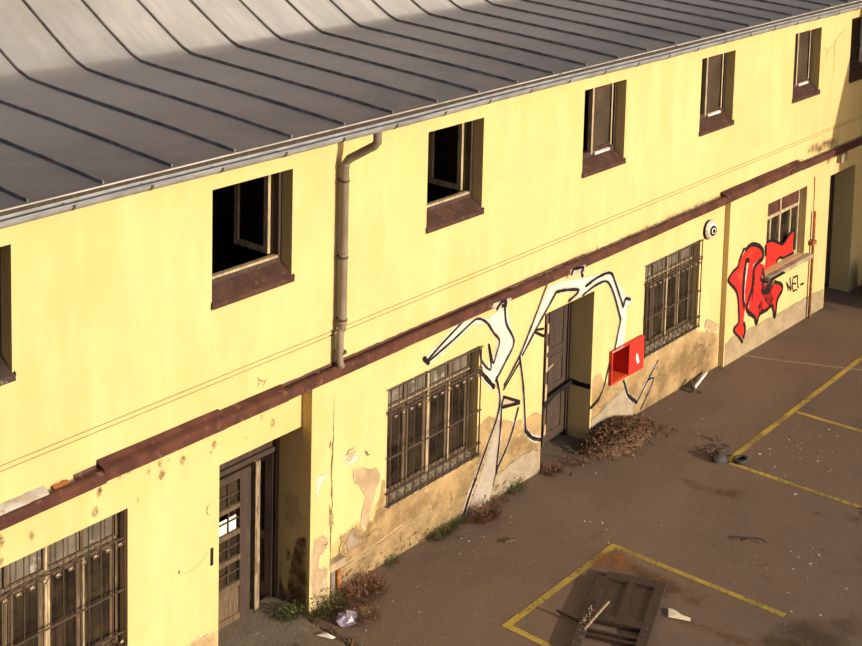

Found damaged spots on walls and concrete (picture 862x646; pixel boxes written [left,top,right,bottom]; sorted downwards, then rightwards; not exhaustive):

flaking render [339,412,541,588]
peeling [311,533,328,609]
flaking render [188,632,217,646]